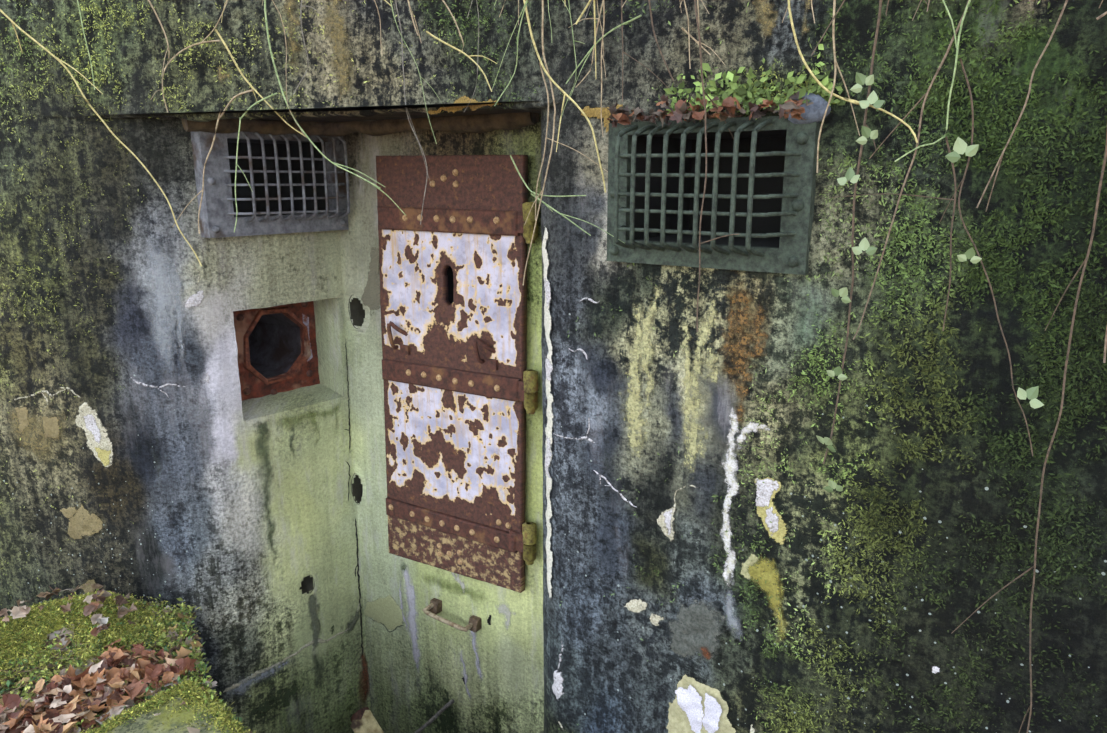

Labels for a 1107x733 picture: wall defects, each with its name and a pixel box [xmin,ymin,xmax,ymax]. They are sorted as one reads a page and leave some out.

damp [150,253,183,357]
rust [722,290,768,422]
peeling [10,402,113,467]
crack [553,418,595,443]
spalling [60,504,103,539]
crack [593,470,636,507]
spalling [657,485,695,541]
damp [721,408,769,581]
spalling [754,477,788,545]
damp [727,598,738,629]